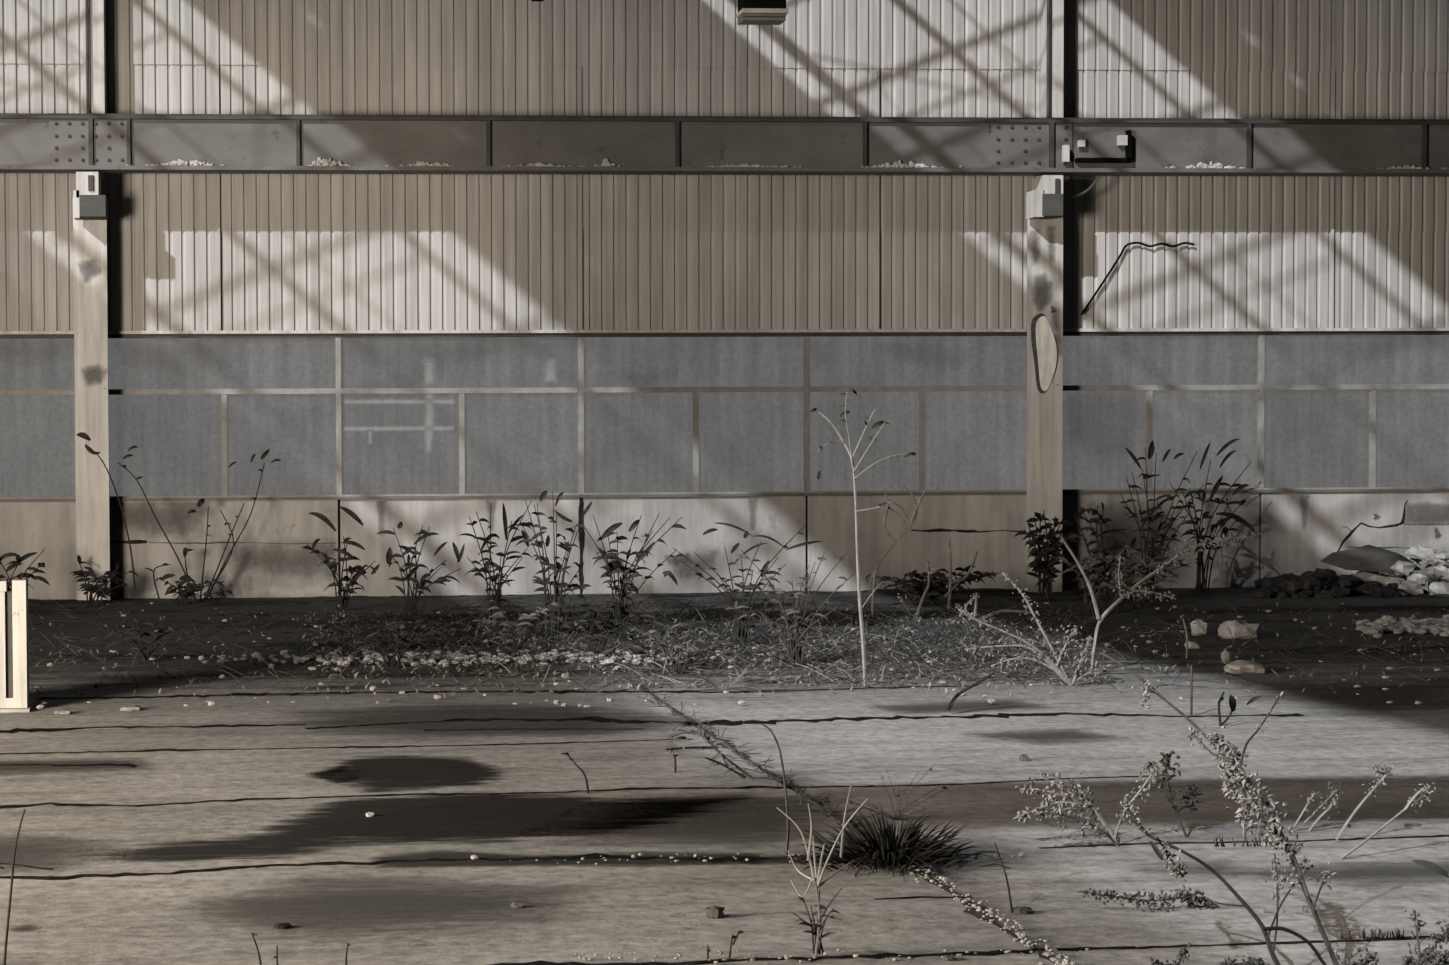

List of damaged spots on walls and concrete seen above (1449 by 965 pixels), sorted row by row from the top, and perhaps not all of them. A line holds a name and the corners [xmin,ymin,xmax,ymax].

water stain [0,756,849,931]